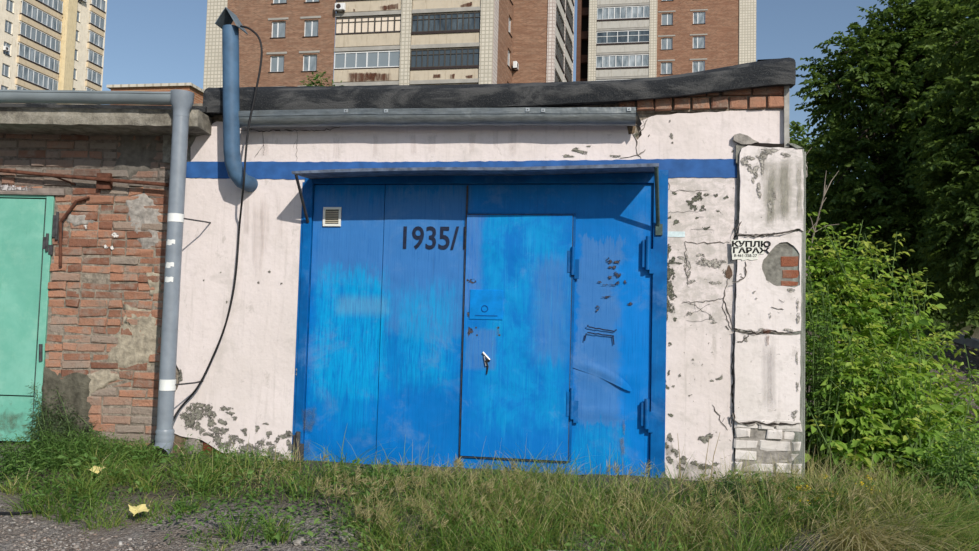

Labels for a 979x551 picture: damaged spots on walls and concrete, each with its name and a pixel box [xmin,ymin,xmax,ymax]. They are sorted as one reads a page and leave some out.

peeling [114,135,172,180]
peeling [66,214,95,229]
peeling [125,193,162,249]
peeling [672,191,729,230]
peeling [596,257,627,311]
peeling [667,244,736,321]
crack [668,182,801,430]
peeling [173,402,293,460]